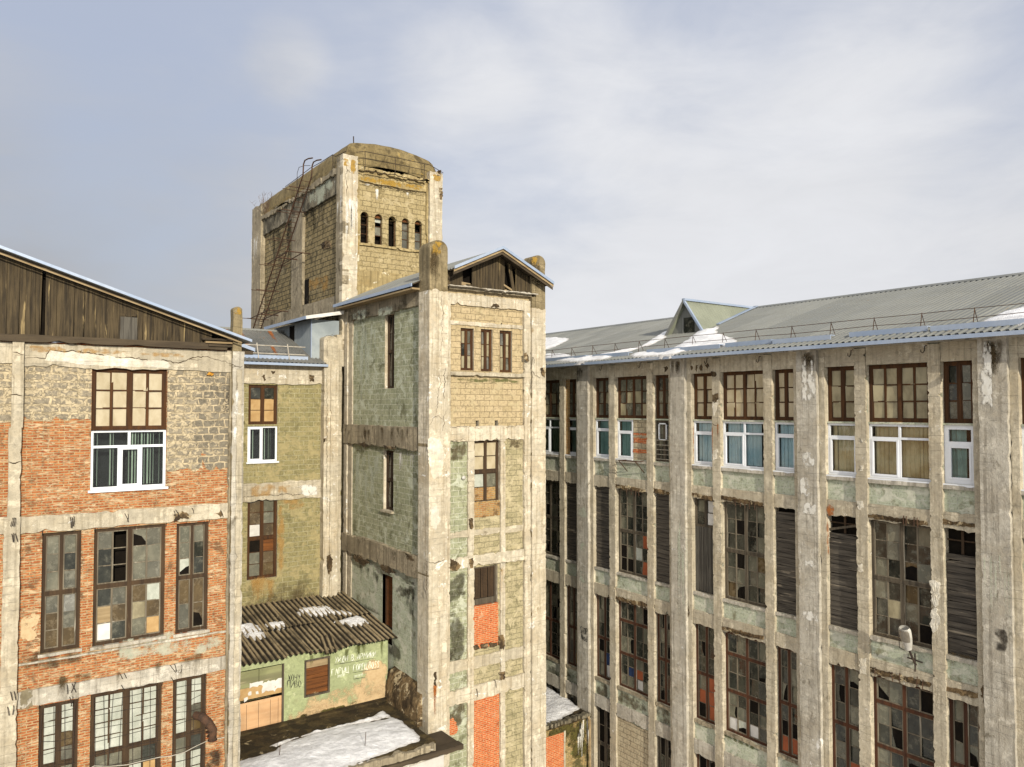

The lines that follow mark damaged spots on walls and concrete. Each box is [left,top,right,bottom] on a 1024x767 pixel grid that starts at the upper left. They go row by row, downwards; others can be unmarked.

crack [15,350,272,400]
spalling [166,508,194,525]
damp [449,574,464,601]
spalling [929,580,941,633]
damp [450,620,464,660]
spalling [859,658,932,690]